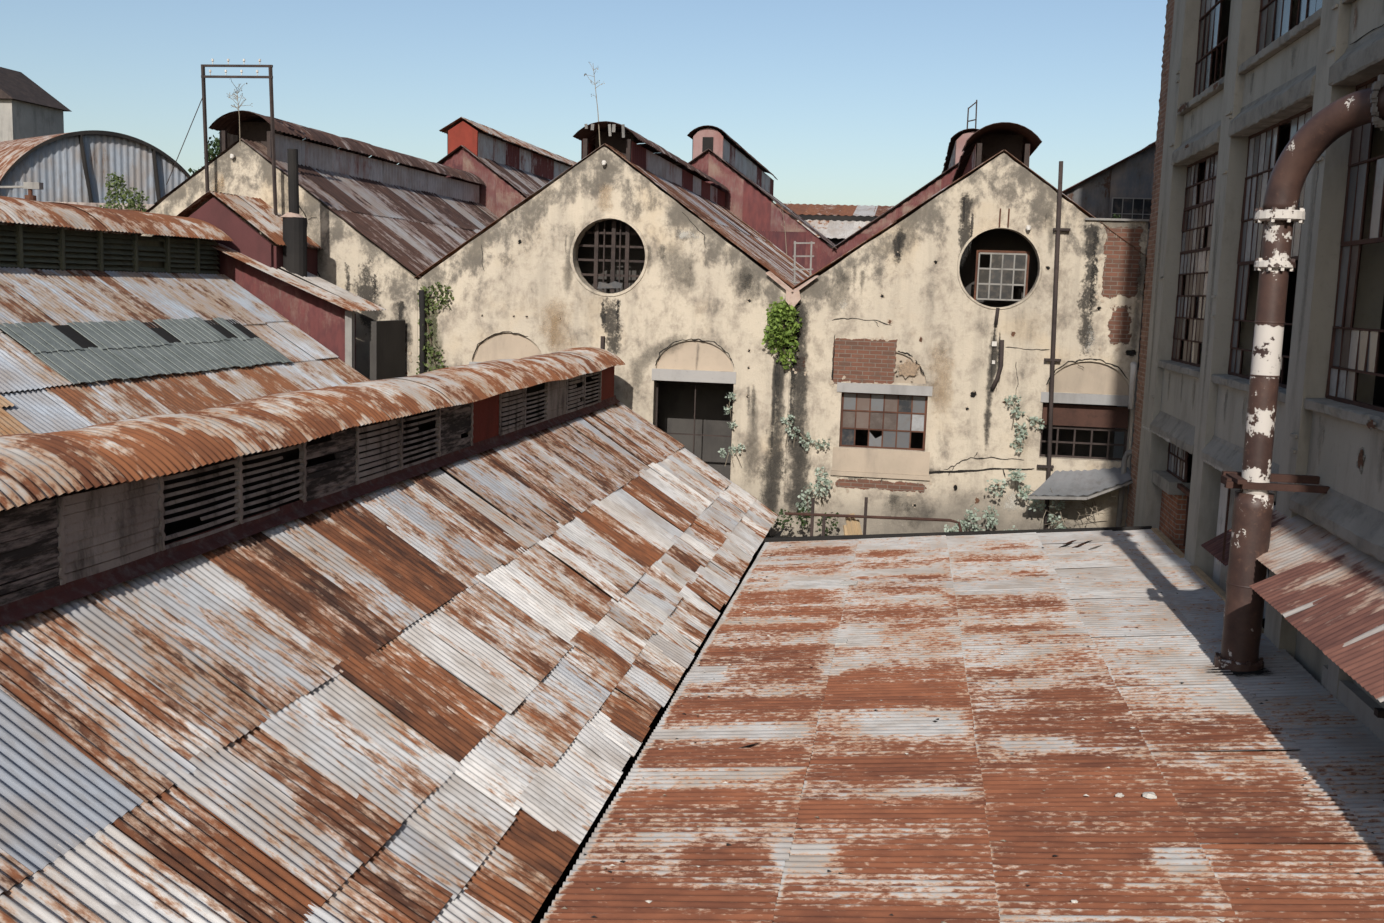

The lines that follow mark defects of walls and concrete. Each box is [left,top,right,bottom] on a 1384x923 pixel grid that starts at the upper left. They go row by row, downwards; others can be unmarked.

leakage [958,195,974,265]
leakage [1077,223,1101,351]
spalling [1095,0,1188,527]
leakage [600,300,623,354]
flaking render [829,319,923,387]
rust [0,395,33,436]
leakage [761,303,810,511]
crack [929,453,1034,477]